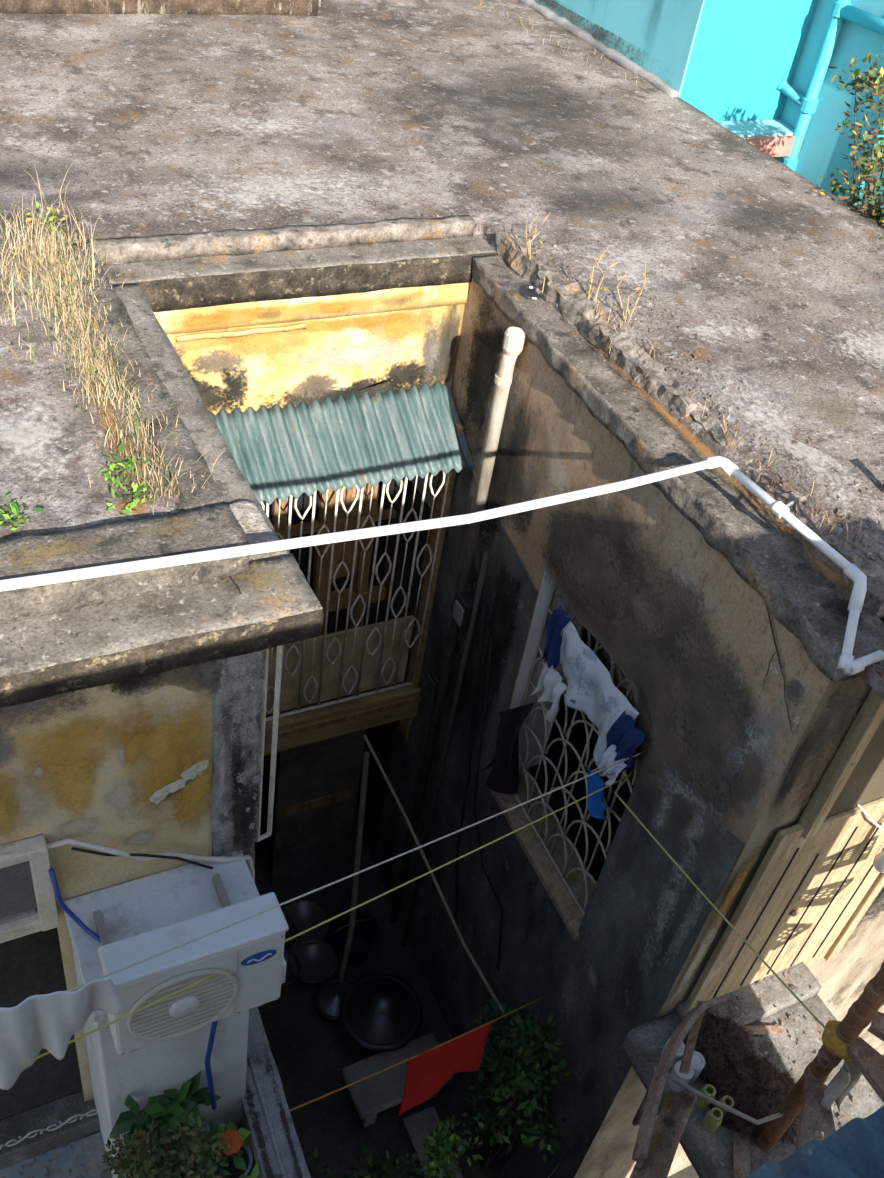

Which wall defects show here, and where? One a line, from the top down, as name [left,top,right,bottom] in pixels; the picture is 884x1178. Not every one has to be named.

water stain [538,0,643,65]
water stain [174,347,249,414]
water stain [257,301,543,545]
water stain [0,658,228,833]
spalling [148,669,265,829]
water stain [220,704,260,855]
rust [718,862,751,915]